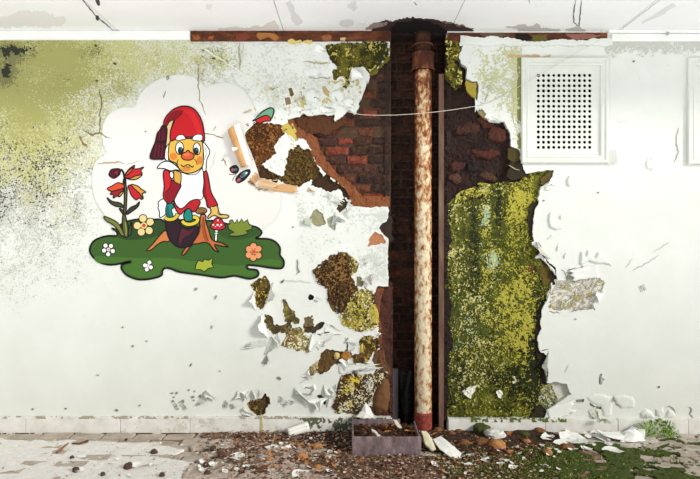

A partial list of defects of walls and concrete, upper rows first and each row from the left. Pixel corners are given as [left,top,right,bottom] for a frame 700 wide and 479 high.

mould [0,40,51,91]
rust [236,33,279,42]
flaking render [245,42,394,247]
leakage [0,120,110,323]
spalling [437,37,531,419]
flaking render [526,239,605,310]
spalling [244,252,393,419]
flaking render [197,388,288,417]
flaking render [539,351,635,419]